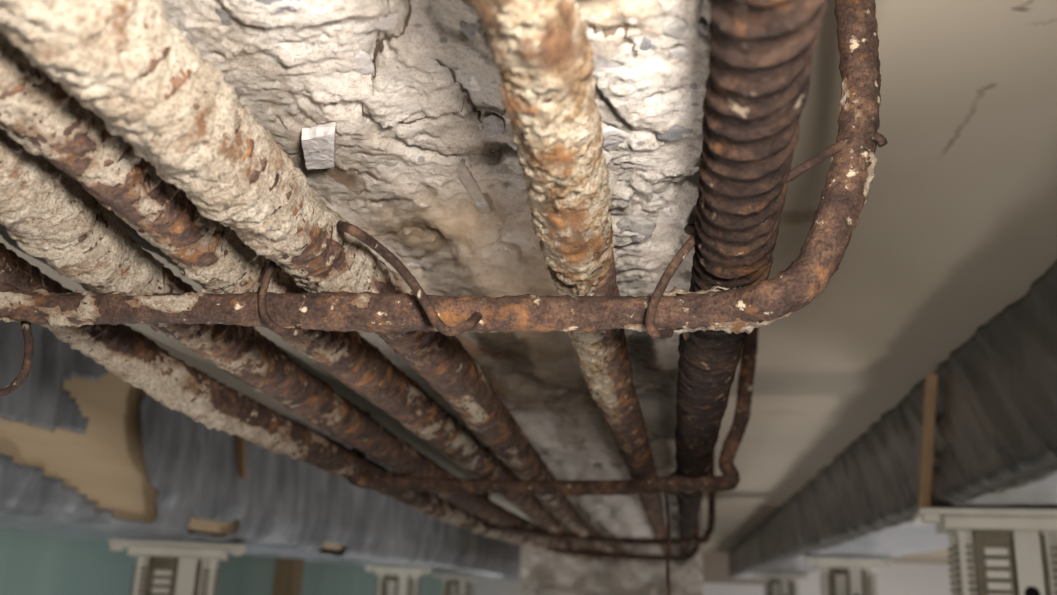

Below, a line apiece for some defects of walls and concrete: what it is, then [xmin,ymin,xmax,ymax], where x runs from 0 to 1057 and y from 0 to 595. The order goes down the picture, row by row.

rust [521,0,588,71]
rust [327,168,358,189]
spalling [0,0,828,297]
rust [540,204,602,264]
spalling [40,323,748,481]
spalling [375,490,703,563]